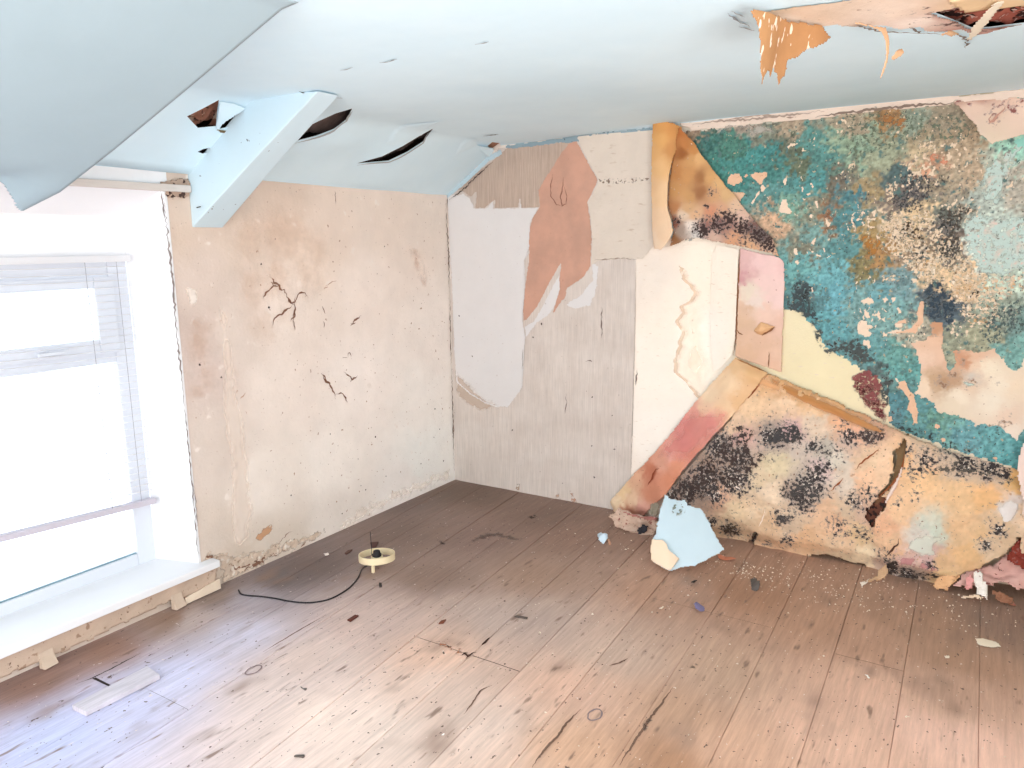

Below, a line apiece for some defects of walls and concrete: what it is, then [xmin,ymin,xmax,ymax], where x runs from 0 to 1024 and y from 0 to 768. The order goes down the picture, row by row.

peeling [751,0,1022,85]
flaking render [523,141,597,320]
crack [263,278,335,327]
peeling [651,89,1024,470]
crack [321,352,358,401]
mould [667,424,832,505]
flaking render [205,532,321,582]
mould [887,536,941,580]